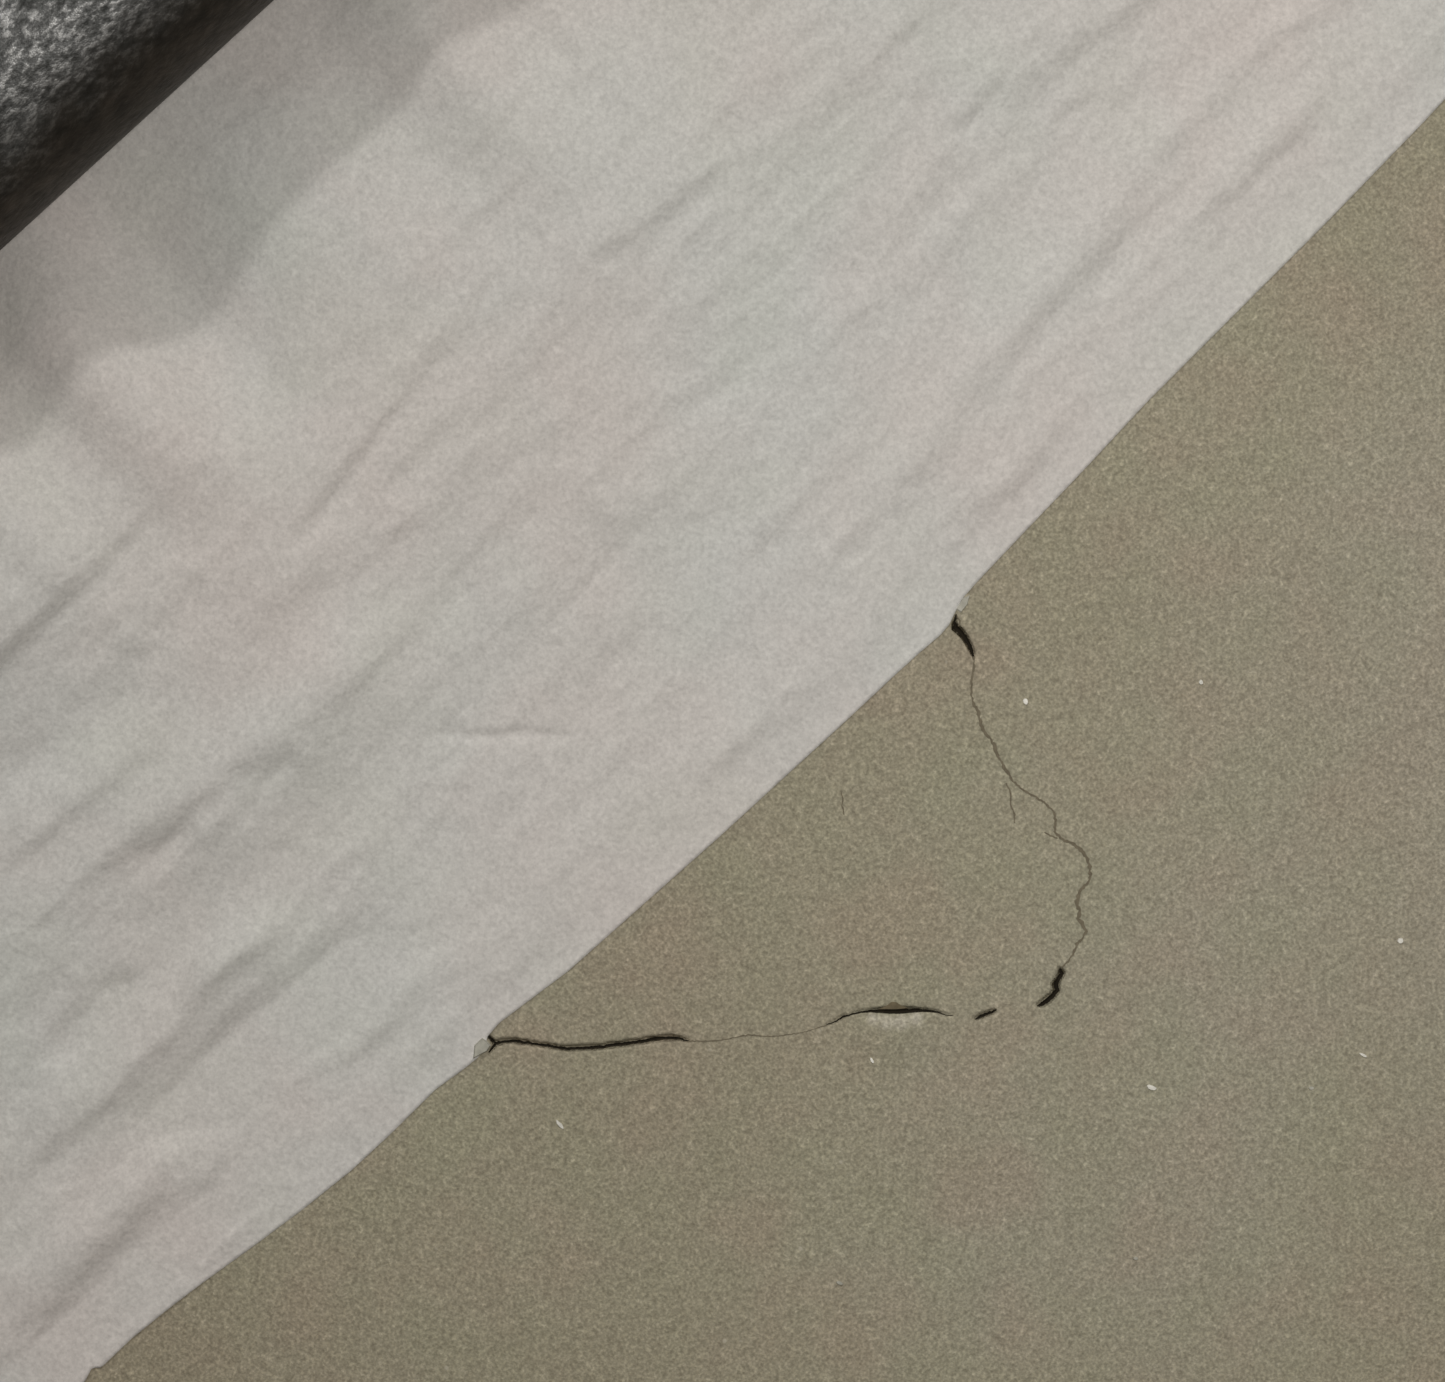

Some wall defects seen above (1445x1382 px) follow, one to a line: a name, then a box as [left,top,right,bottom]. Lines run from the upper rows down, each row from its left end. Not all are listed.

crack [953,595,1093,1006]
crack [473,1002,997,1071]